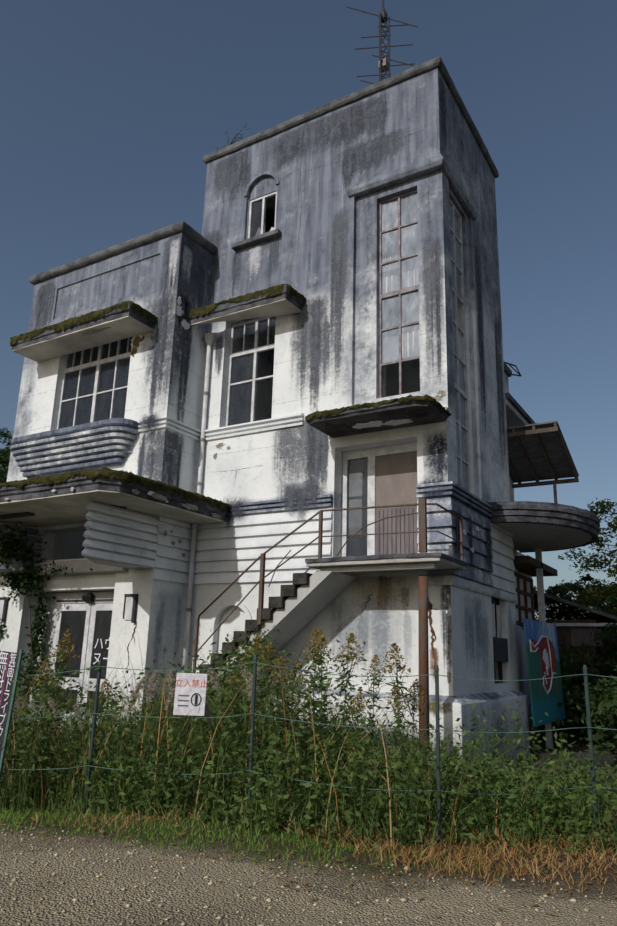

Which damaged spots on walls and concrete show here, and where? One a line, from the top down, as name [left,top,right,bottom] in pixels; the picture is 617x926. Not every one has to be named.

water stain [275,98,404,184]
water stain [138,232,220,488]
spalling [177,296,190,330]
water stain [232,239,279,295]
water stain [291,211,348,401]
water stain [424,241,443,360]
water stain [274,420,356,514]